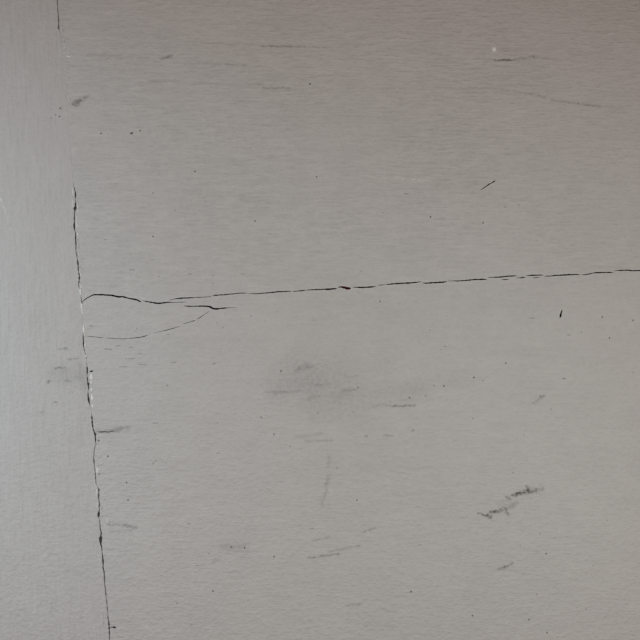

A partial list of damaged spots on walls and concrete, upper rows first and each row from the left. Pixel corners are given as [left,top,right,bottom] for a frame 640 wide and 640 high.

crack [72,174,640,640]